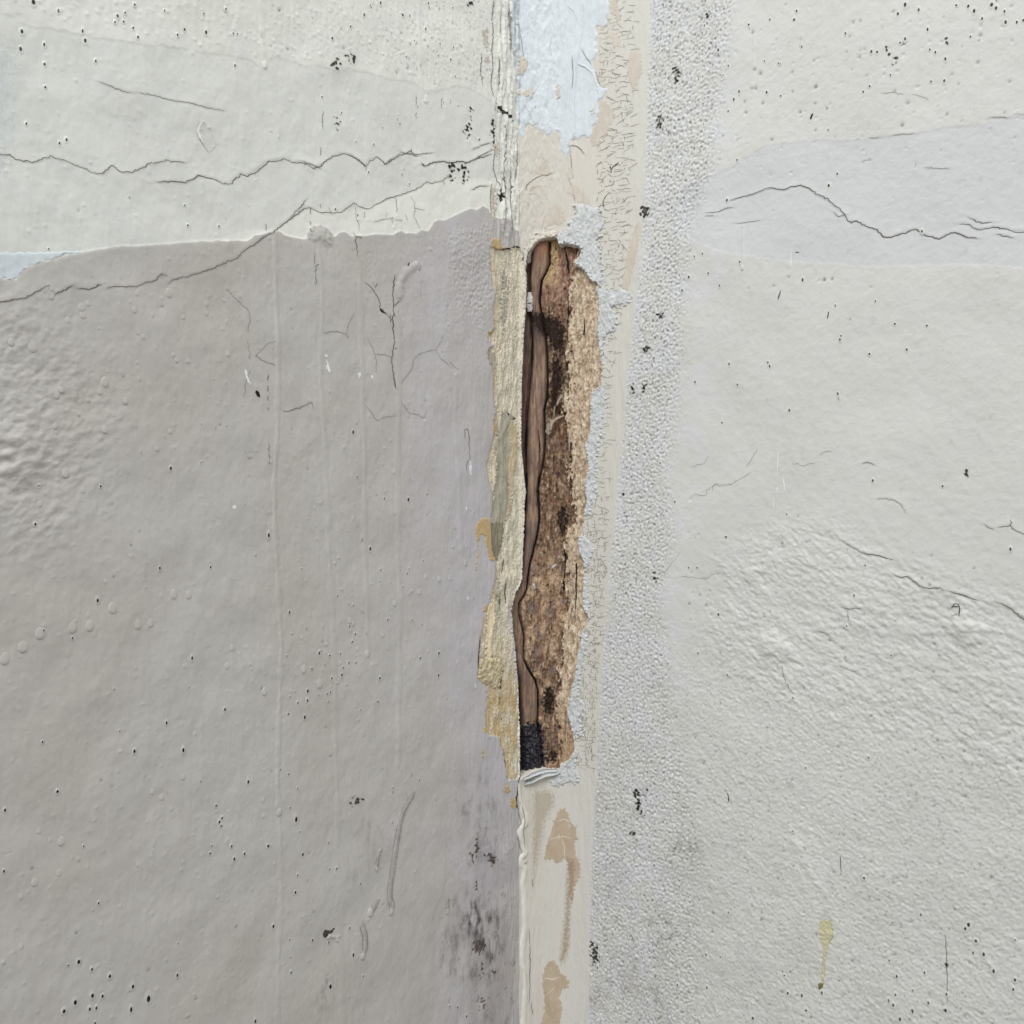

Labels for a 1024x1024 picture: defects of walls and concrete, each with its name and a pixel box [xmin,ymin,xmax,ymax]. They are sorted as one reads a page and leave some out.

crack [0,1,639,771]
spalling [475,202,642,809]
crack [708,184,1024,240]
water stain [561,866,571,960]